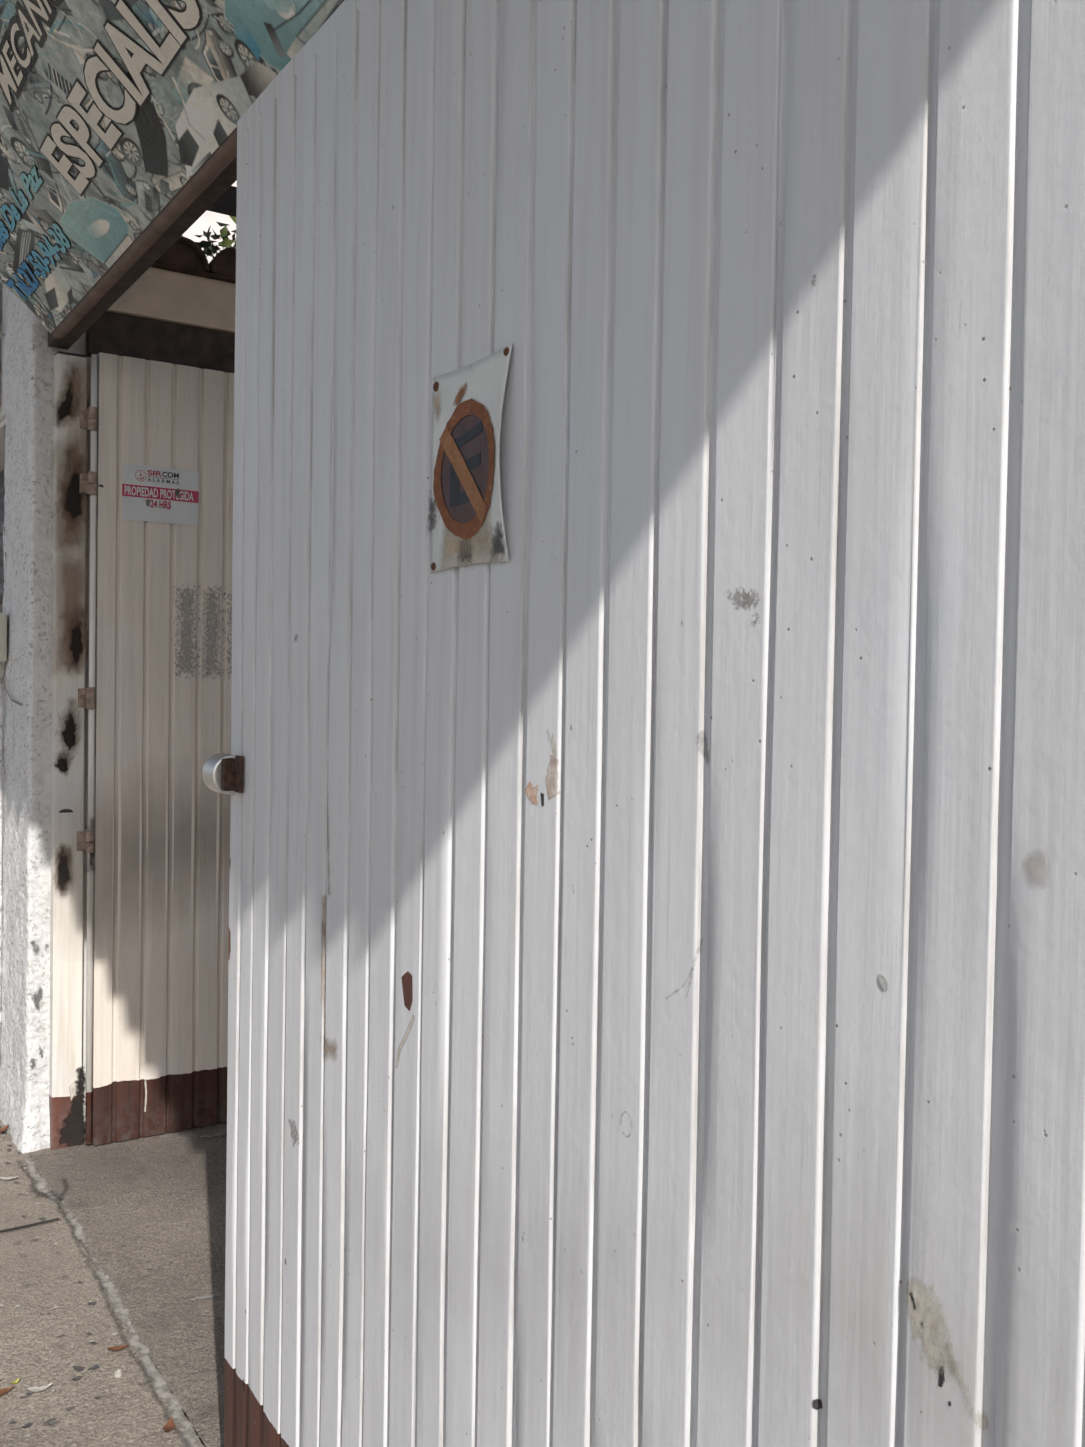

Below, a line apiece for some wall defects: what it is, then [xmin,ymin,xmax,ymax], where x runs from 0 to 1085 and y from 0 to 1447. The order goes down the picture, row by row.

peeling [525,737,558,806]